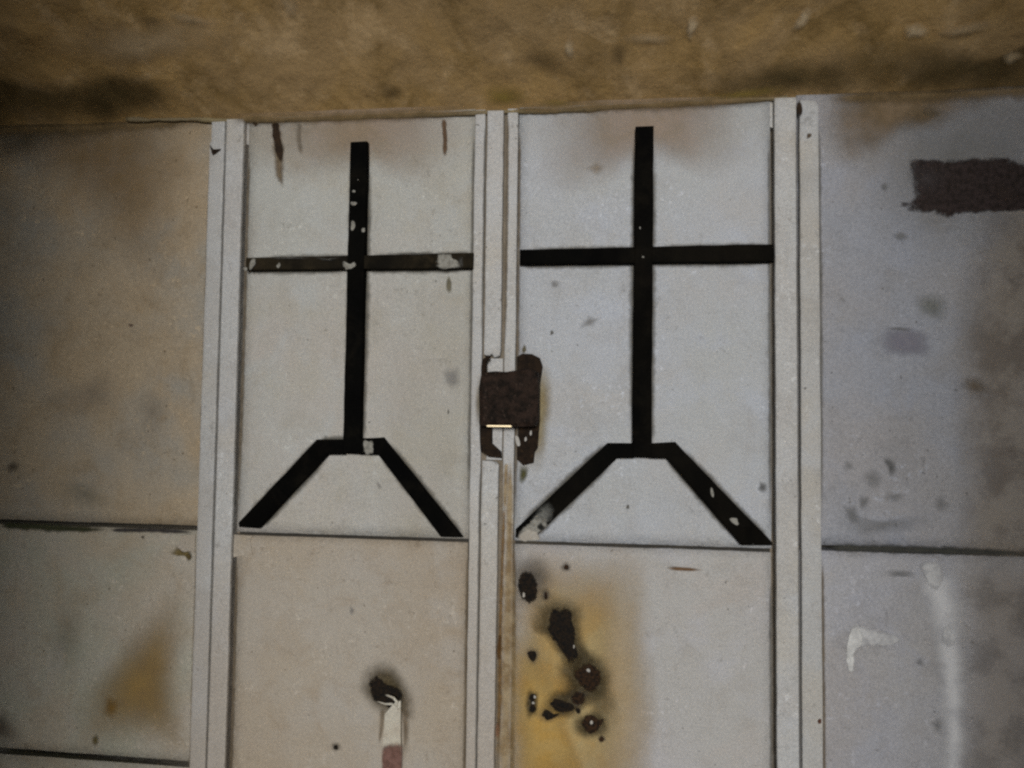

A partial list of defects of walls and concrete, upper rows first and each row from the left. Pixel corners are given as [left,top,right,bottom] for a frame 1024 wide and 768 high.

rust [272,122,283,181]
peeling [903,158,1024,217]
rust [538,382,547,446]
rust [496,465,640,768]